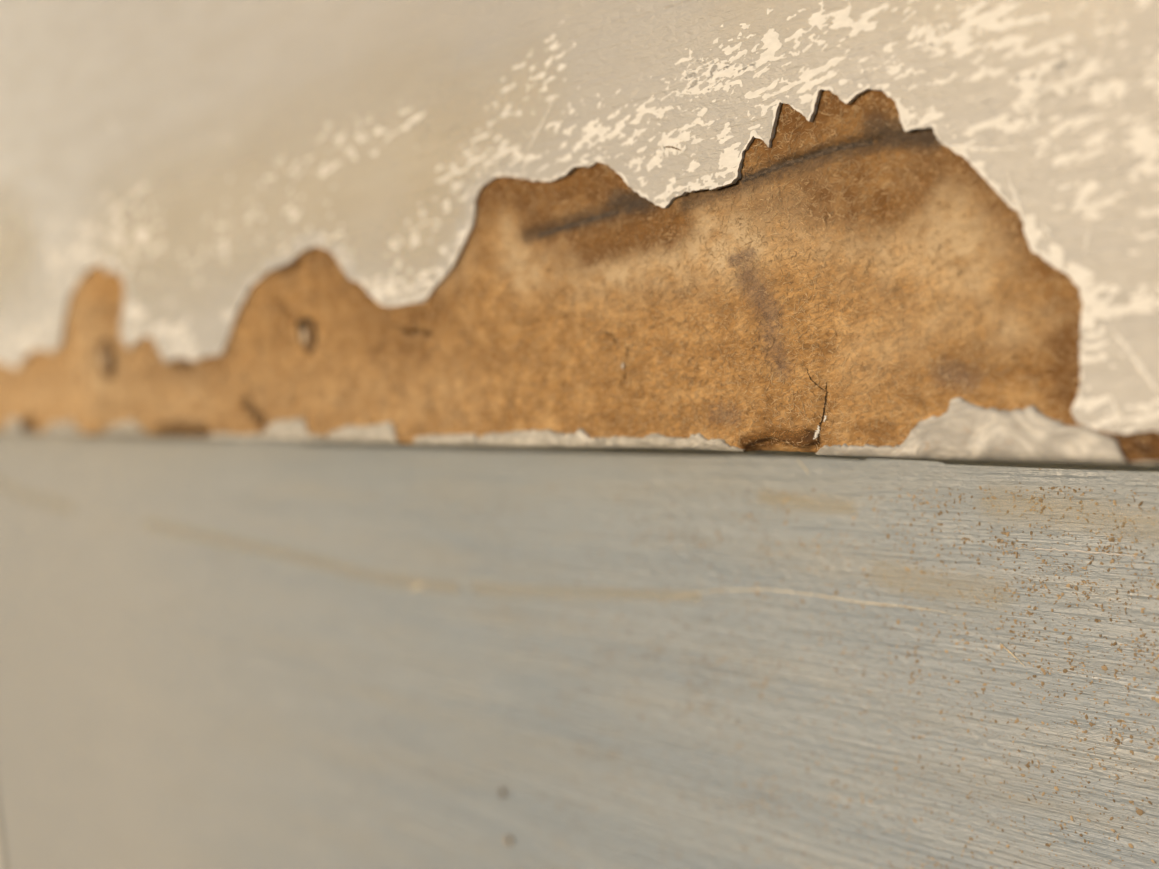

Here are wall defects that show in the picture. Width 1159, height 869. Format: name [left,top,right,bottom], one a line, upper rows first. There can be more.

peeling [0,84,1159,465]